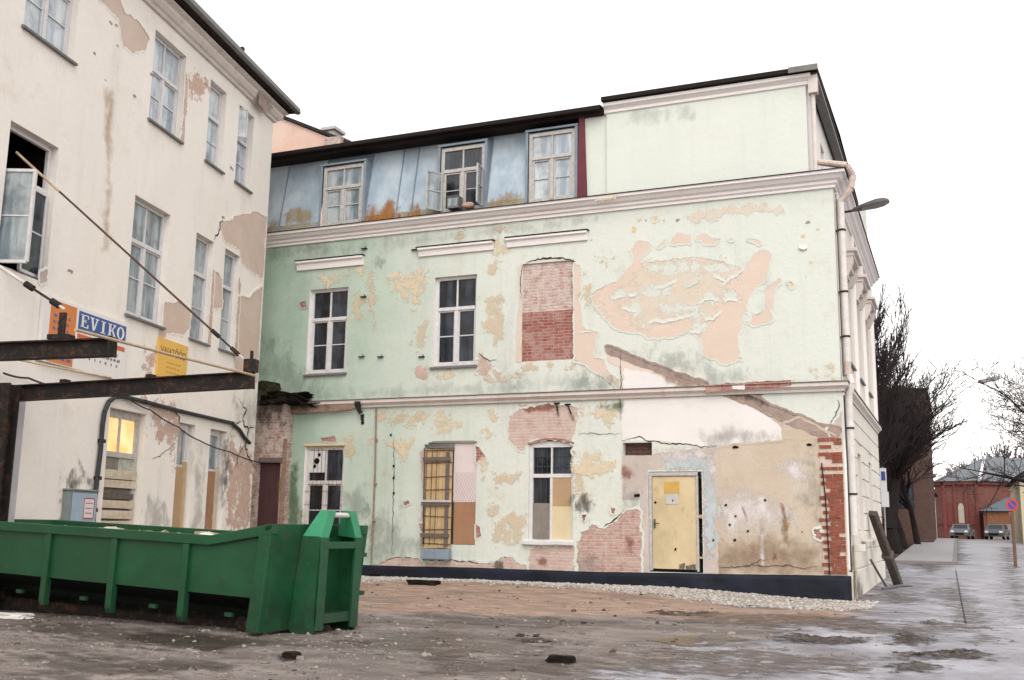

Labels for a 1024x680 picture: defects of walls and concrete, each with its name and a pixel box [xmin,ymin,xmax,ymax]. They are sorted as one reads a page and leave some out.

peeling [98,0,150,55]
corrosion [365,201,420,221]
peeling [207,209,267,385]
peeling [318,264,429,353]
peeling [140,396,181,469]
crack [232,398,256,469]
peeling [368,201,845,575]
crack [580,355,710,448]
crack [380,434,526,566]